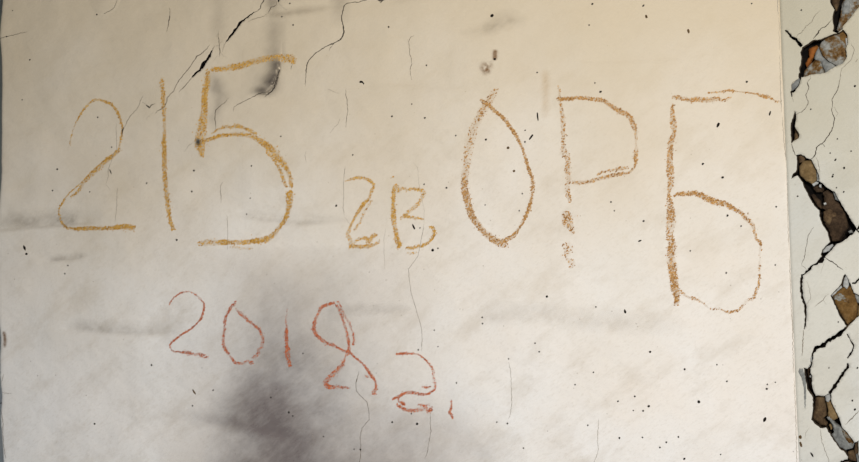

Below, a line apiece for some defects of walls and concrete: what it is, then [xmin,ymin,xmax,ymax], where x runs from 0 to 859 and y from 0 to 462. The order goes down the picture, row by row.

crack [107,31,226,217]
crack [214,0,383,129]
crack [777,1,858,171]
spalling [792,0,859,91]
spalling [793,154,858,255]
crack [787,189,859,462]
spalling [831,275,859,329]
spalling [798,356,859,462]